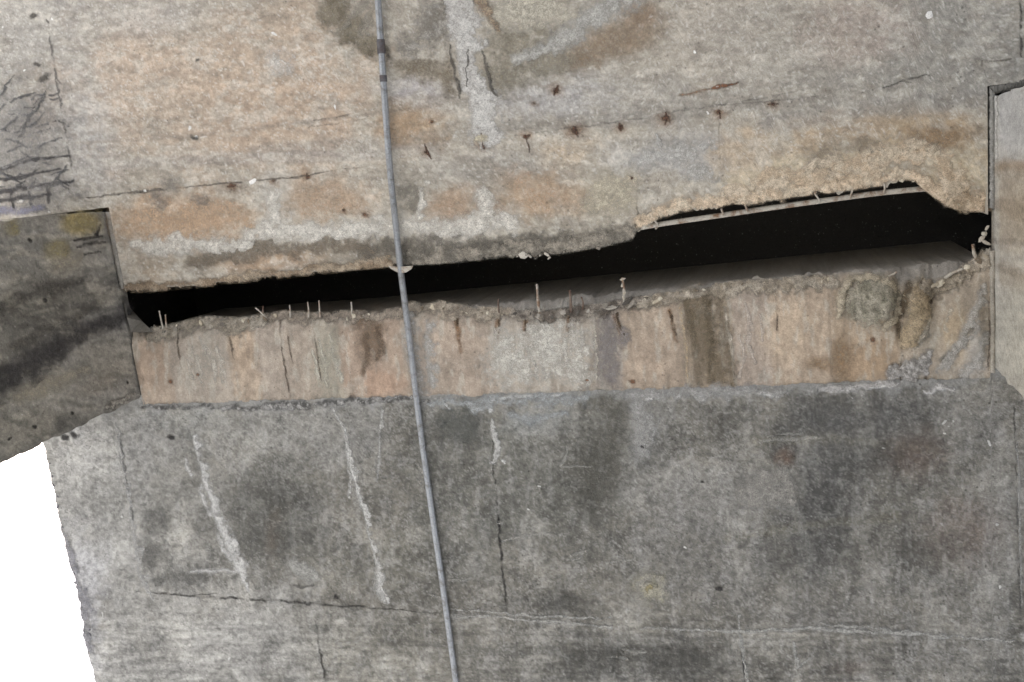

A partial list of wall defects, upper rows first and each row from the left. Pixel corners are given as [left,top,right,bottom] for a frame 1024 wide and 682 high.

water stain [316,0,454,92]
crack [449,45,498,98]
water stain [485,0,652,90]
crack [87,172,322,198]
spalling [123,134,991,292]
spalling [146,274,840,342]
spalling [918,250,991,300]
water stain [403,311,630,464]
water stain [813,343,901,393]
water stain [332,409,390,603]
crack [492,440,507,602]
crack [136,591,415,612]